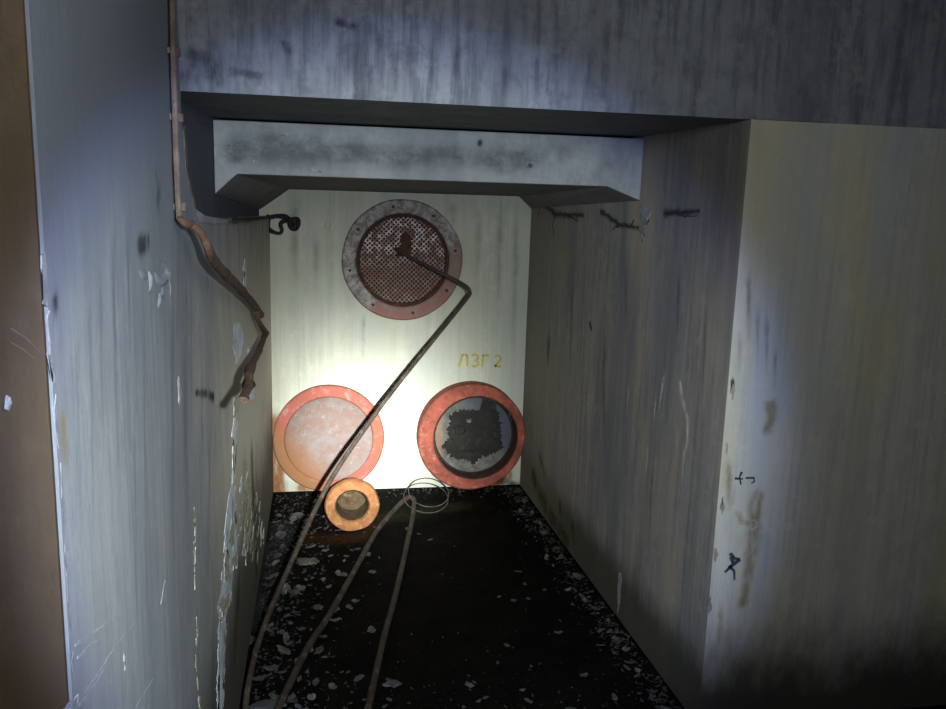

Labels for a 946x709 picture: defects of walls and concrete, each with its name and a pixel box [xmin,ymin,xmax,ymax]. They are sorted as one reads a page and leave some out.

peeling [232,322,253,364]
peeling [216,396,264,709]